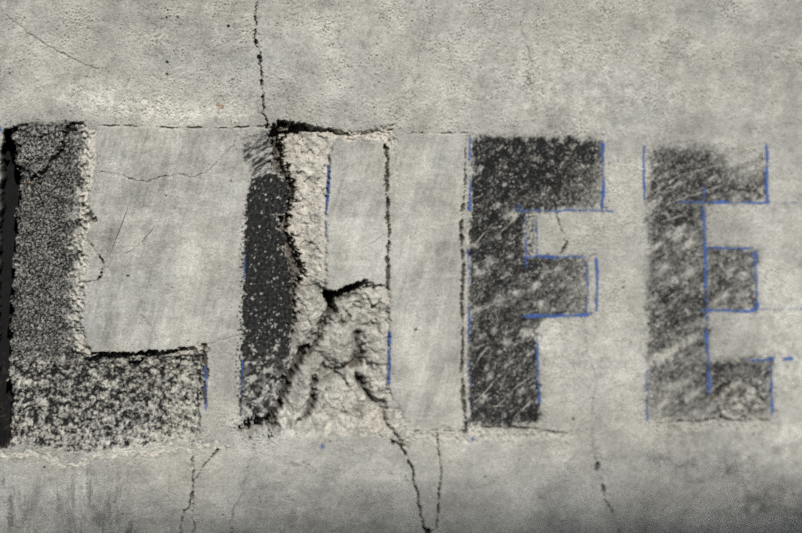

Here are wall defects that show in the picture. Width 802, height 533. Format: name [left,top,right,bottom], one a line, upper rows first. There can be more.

peeling [112,98,176,124]
peeling [207,92,263,129]
crack [253,0,270,131]
spalling [0,120,609,494]
crack [552,197,620,533]
crack [180,445,220,533]
crack [230,444,256,533]
crack [389,429,443,533]